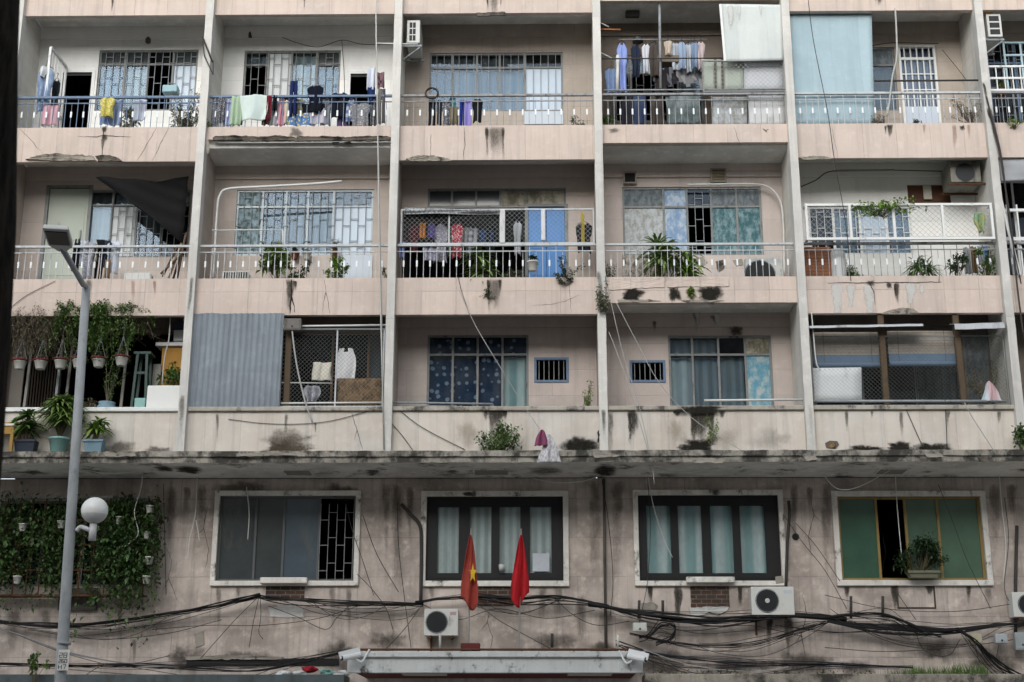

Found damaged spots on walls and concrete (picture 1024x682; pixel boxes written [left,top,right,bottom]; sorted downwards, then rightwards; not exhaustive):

crack [80,129,164,157]
damp [485,127,505,147]
damp [287,281,297,300]
damp [623,288,645,303]
damp [669,287,681,300]
damp [694,286,723,325]
peeling [831,284,924,315]
damp [269,415,316,451]
damp [561,437,598,450]
damp [628,411,637,436]
damp [674,406,724,450]
damp [848,442,950,450]